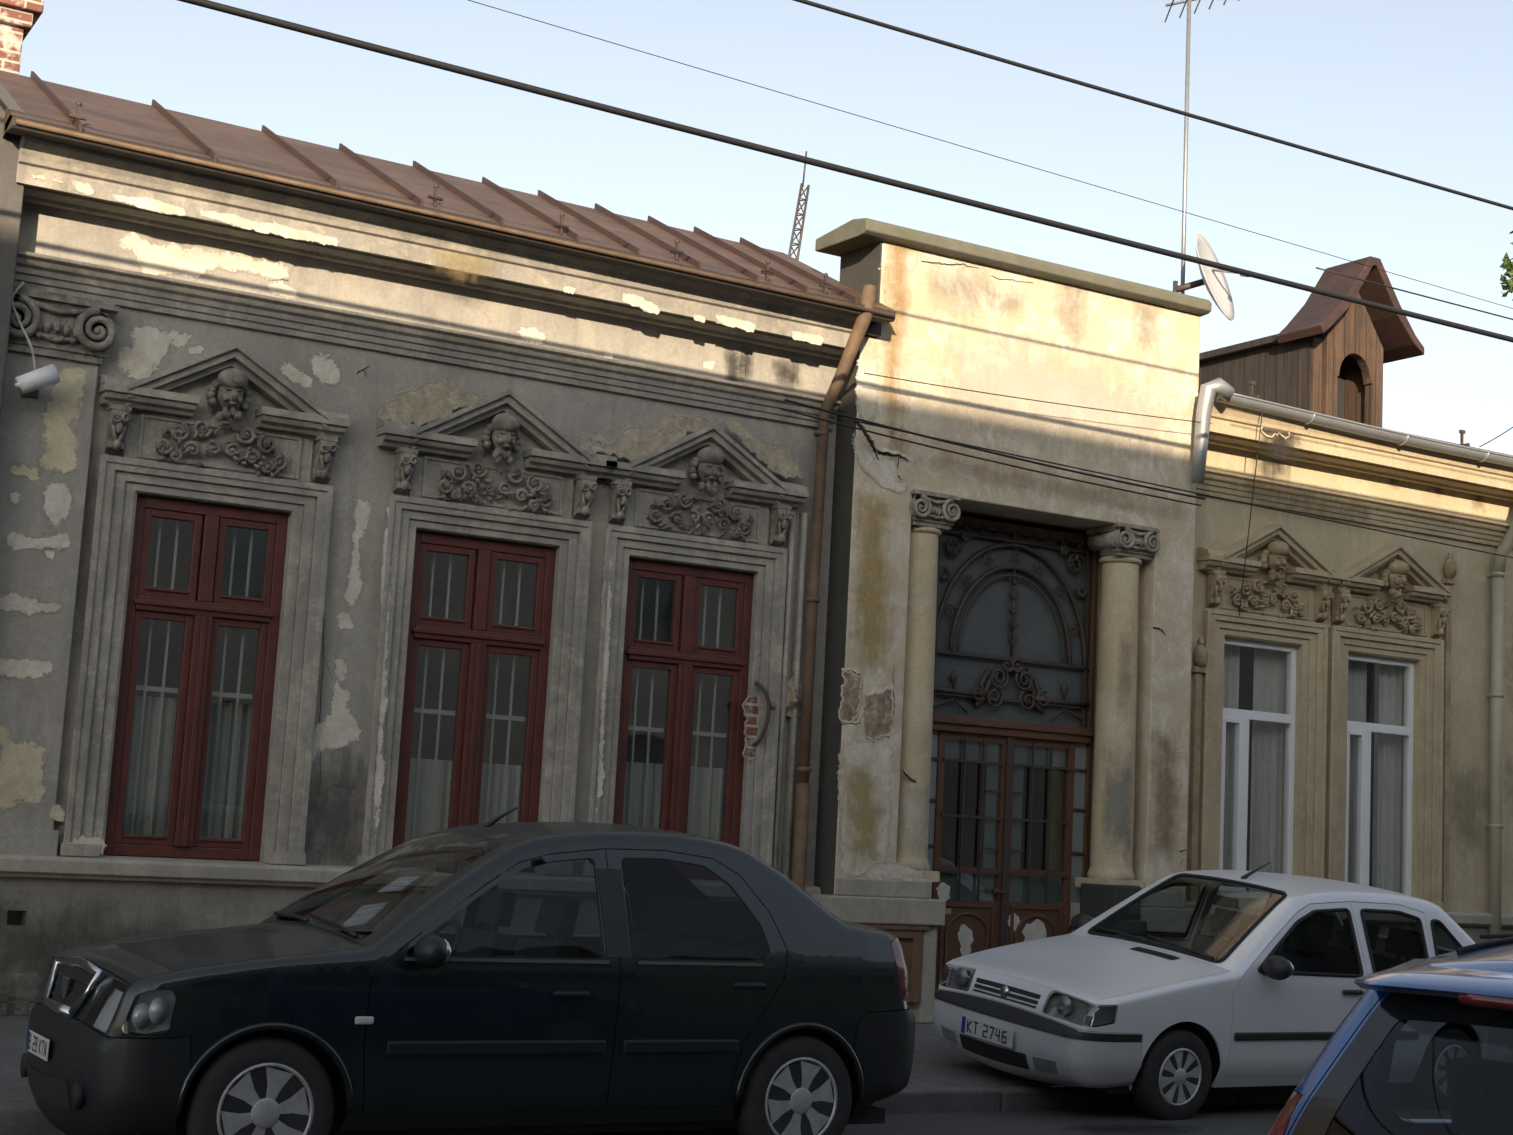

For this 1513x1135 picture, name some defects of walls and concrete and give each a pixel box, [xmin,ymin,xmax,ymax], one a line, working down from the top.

peeling [32,174,94,195]
peeling [112,194,340,247]
peeling [118,230,300,300]
peeling [111,322,205,380]
peeling [279,349,341,389]
peeling [6,364,88,559]
peeling [0,591,63,617]
peeling [0,655,55,681]
peeling [311,497,395,844]
peeling [0,723,65,822]
peeling [837,670,933,882]
peeling [70,834,107,857]